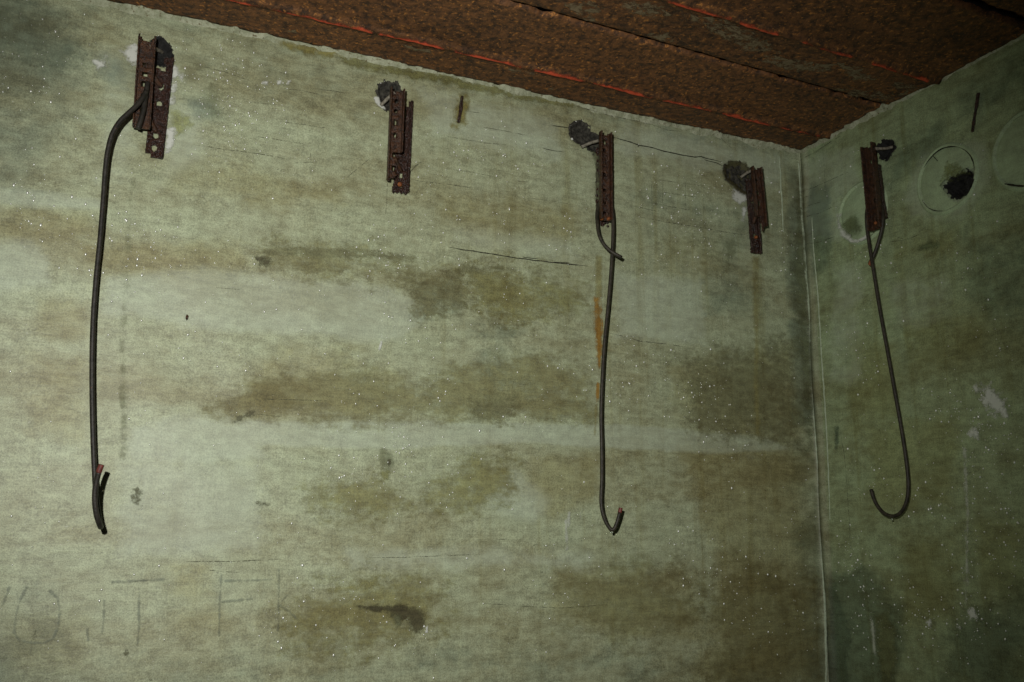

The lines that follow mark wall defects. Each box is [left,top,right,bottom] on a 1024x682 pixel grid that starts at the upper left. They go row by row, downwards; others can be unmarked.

damp [258,240,579,320]
crack [450,247,585,266]
rust [594,297,603,367]
damp [205,356,595,422]
damp [280,575,447,653]